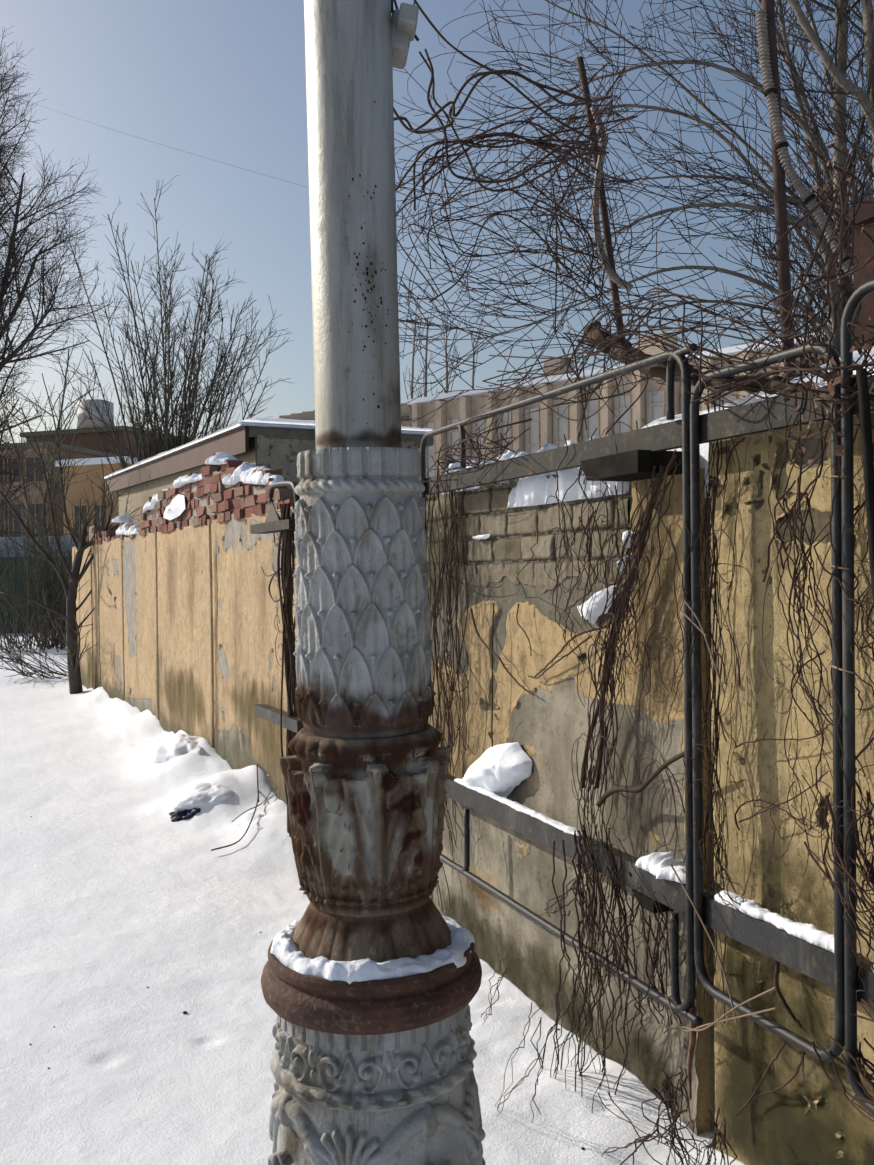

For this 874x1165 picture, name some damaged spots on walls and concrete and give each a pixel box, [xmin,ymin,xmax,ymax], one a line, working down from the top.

rust [299,882,375,937]
rust [288,681,442,869]
spalling [426,478,685,860]
spalling [430,797,699,1135]